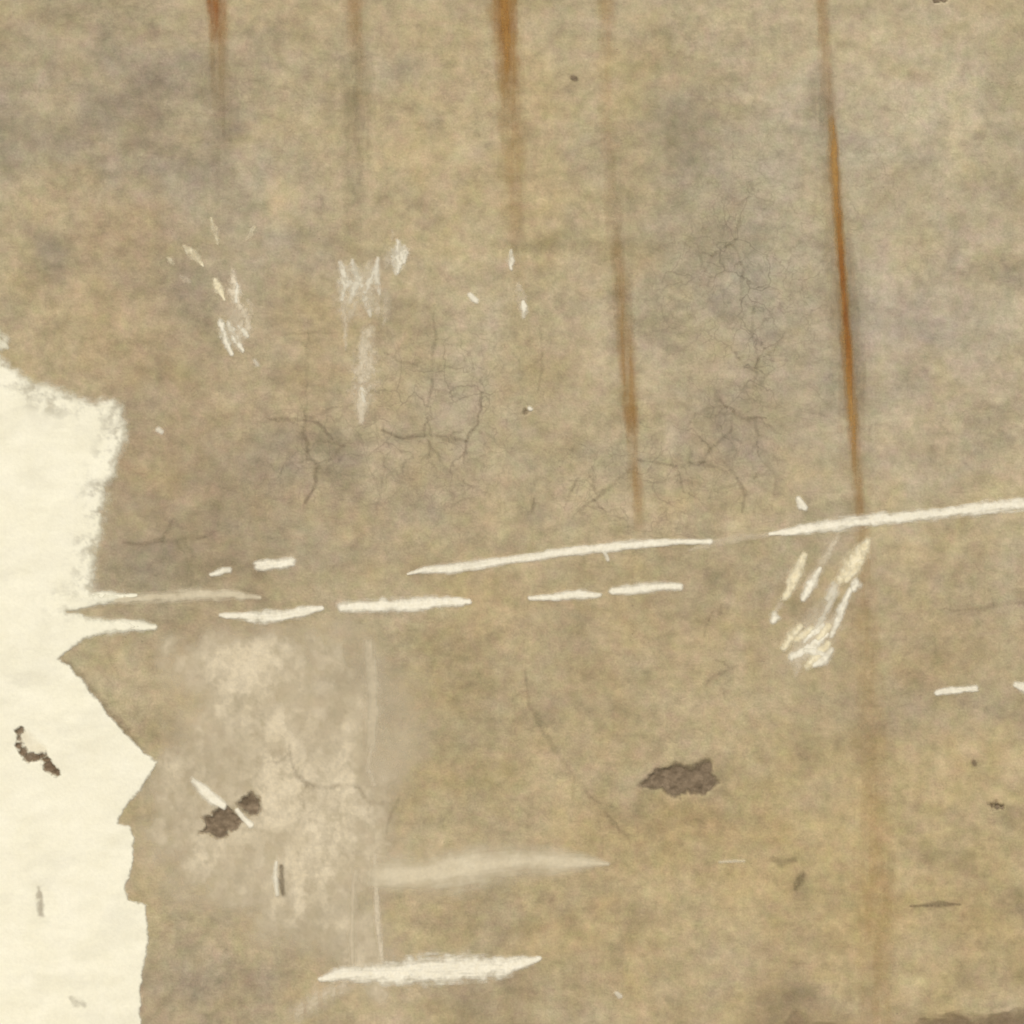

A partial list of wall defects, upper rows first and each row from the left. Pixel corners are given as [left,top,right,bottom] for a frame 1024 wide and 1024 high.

rust [831,122,856,452]
peeling [0,336,157,1024]
spalling [191,778,260,838]
spalling [641,761,718,796]